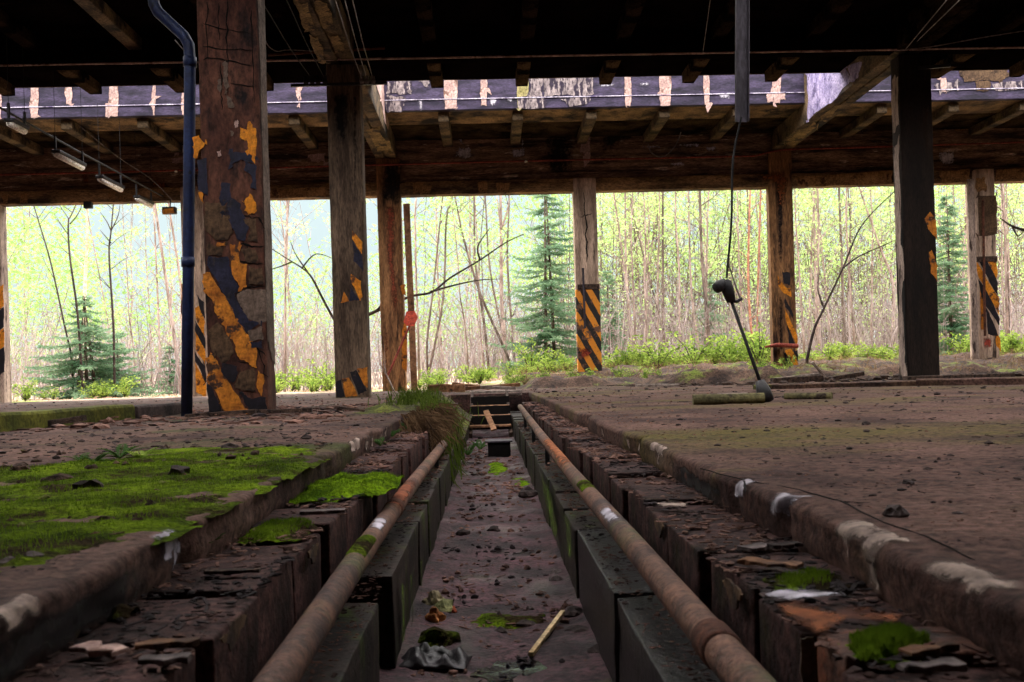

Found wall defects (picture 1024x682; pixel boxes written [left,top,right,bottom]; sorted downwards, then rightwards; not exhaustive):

crack [203,0,255,108]
peeling [29,88,40,119]
peeling [105,86,118,119]
peeling [444,80,458,110]
peeling [516,78,594,111]
peeling [657,76,672,106]
peeling [703,75,713,112]
peeling [934,70,1024,95]
peeling [192,0,328,416]
crack [583,190,592,258]
rust [544,439,572,464]
rust [383,480,415,508]